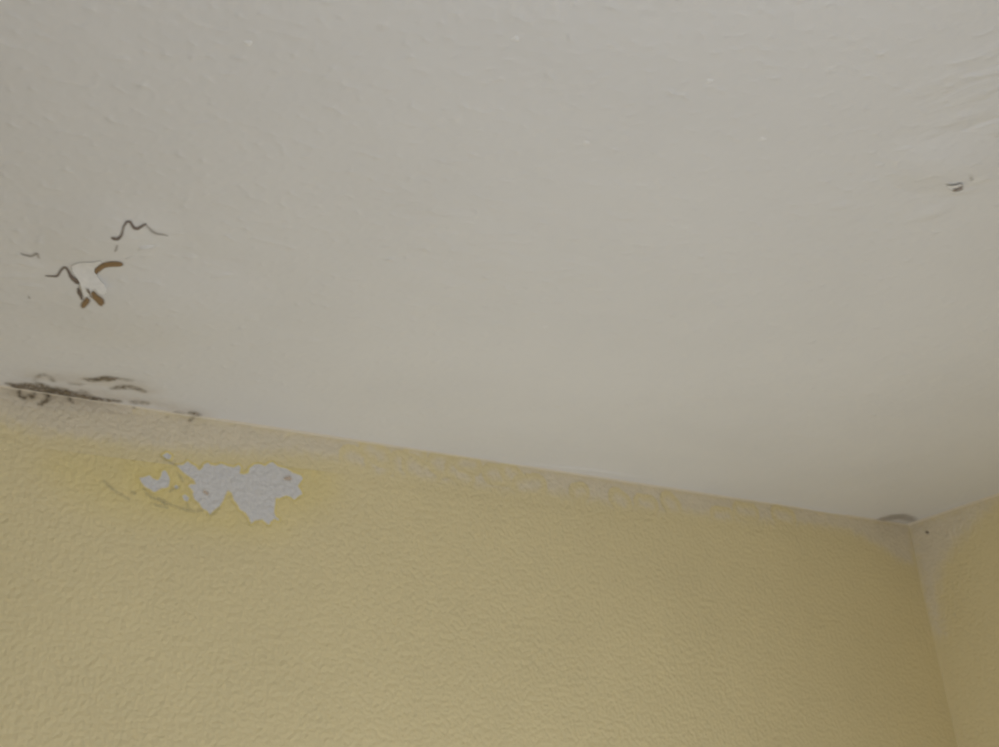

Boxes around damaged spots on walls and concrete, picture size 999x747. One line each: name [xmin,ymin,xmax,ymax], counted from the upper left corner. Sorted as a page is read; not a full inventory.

peeling [27,194,185,308]
crack [111,221,155,260]
water stain [0,364,228,419]
peeling [137,459,305,527]